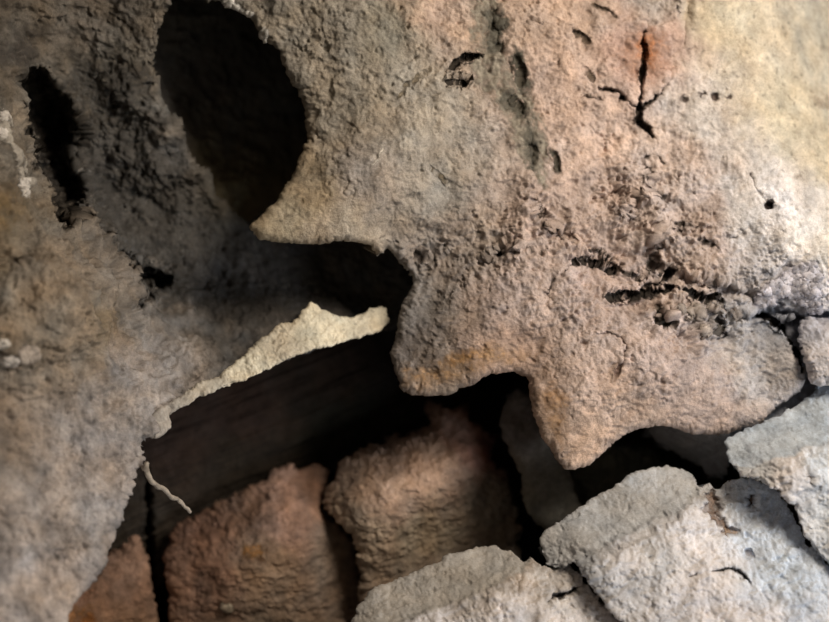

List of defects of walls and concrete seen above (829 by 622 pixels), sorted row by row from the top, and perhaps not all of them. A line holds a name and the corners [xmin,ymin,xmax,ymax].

peeling [222,0,254,18]
peeling [258,28,268,44]
crack [573,30,590,44]
corrosion [624,28,669,74]
crack [398,23,527,116]
crack [586,31,657,138]
crack [528,143,560,173]
crack [432,168,447,184]
crack [674,221,720,249]
crack [571,247,727,320]